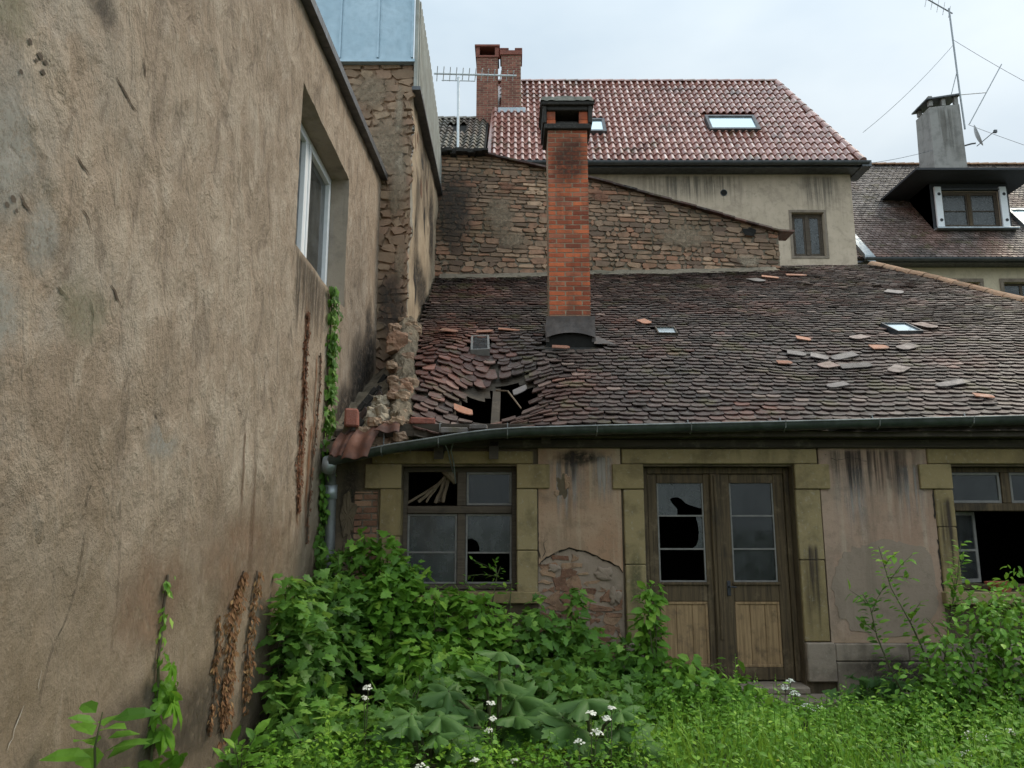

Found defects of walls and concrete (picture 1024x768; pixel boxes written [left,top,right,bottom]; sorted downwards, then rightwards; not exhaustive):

damp [556,451,610,507]
damp [834,450,917,510]
spalling [538,547,626,661]
damp [809,547,820,606]